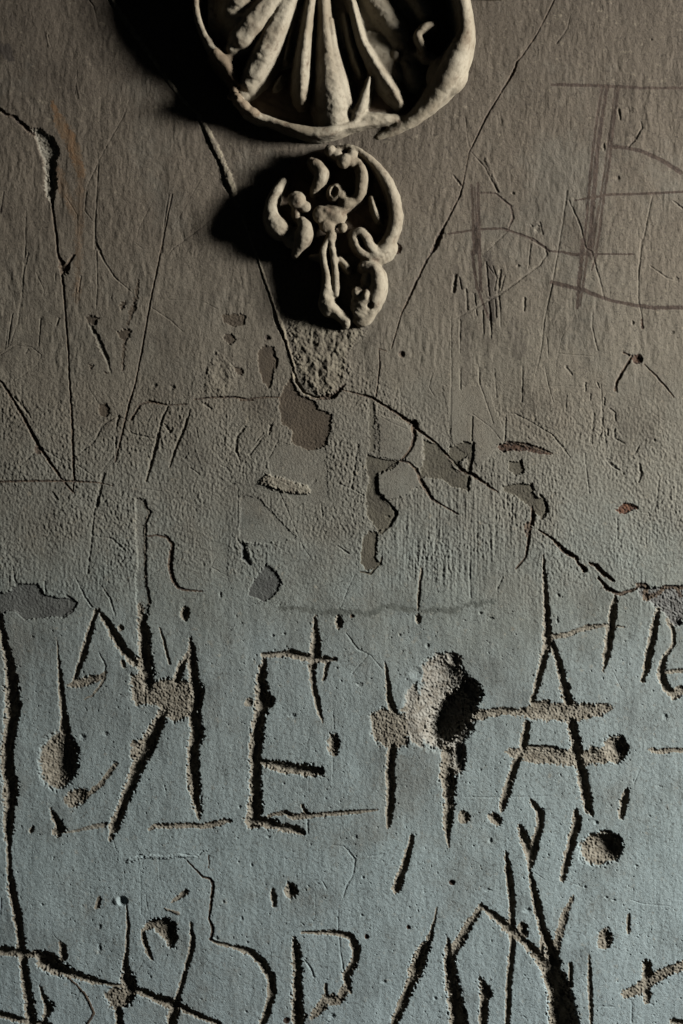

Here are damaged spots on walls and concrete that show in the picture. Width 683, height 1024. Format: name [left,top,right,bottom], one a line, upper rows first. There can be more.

flaking render [256,310,368,452]
peeling [359,398,400,576]
peeling [419,416,476,492]
peeling [501,458,549,520]
peeling [0,582,79,621]
peeling [240,541,283,602]
crack [515,506,640,597]
flaking render [635,582,683,627]
crack [185,854,217,942]